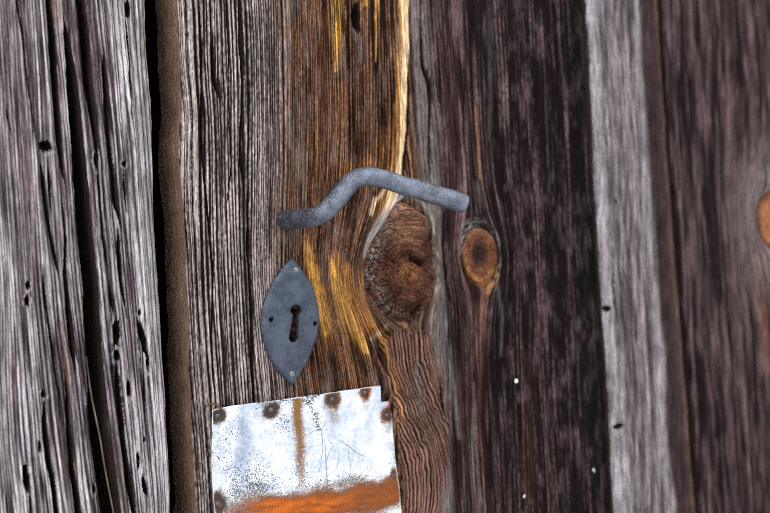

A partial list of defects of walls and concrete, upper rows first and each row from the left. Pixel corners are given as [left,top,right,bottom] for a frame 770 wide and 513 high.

corrosion [324,392,342,420]
corrosion [358,388,372,402]
corrosion [213,398,400,513]